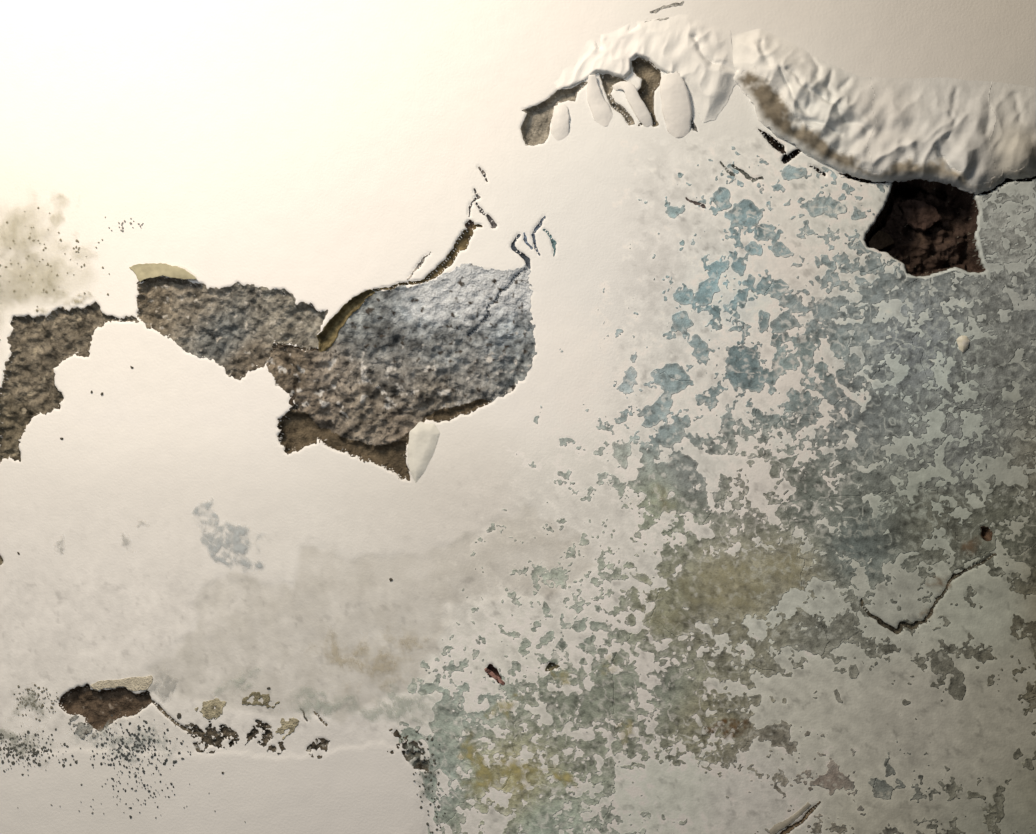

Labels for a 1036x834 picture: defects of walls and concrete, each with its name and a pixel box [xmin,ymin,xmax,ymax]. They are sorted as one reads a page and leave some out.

spalling [0,263,537,483]
peeling [387,146,1036,834]
crack [860,553,997,634]
mould [0,684,191,819]
spalling [58,675,153,741]
spalling [185,698,299,755]
spalling [242,692,280,708]
spalling [306,738,330,759]